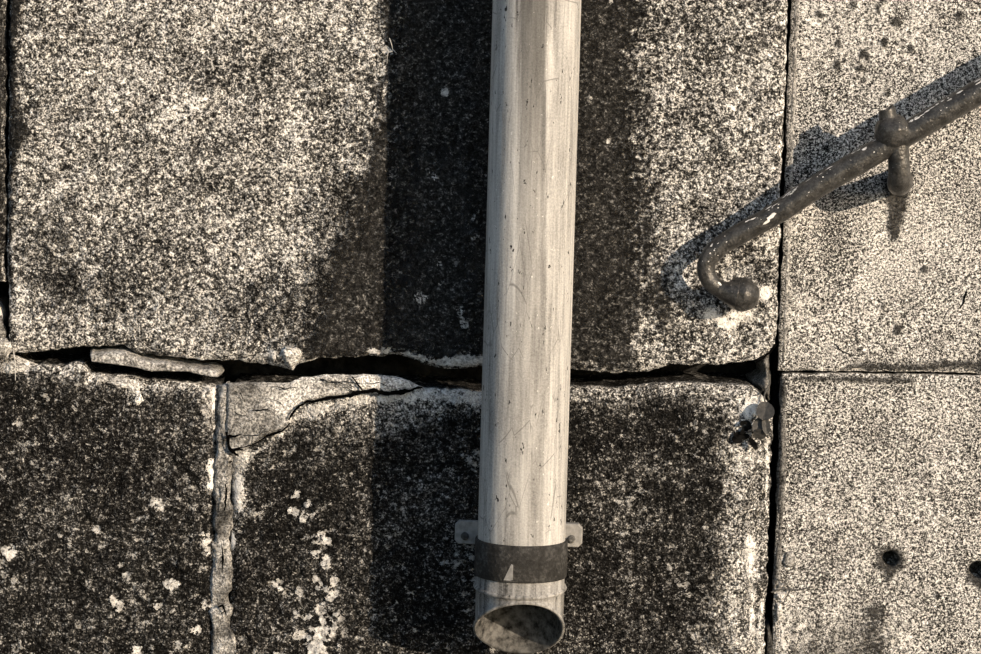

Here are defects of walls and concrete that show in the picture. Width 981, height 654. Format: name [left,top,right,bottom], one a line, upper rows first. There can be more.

water stain [297,0,493,368]
crack [756,343,777,363]
water stain [735,396,763,419]
crack [223,377,423,511]
water stain [205,458,214,494]
water stain [232,472,247,513]
water stain [742,431,770,654]